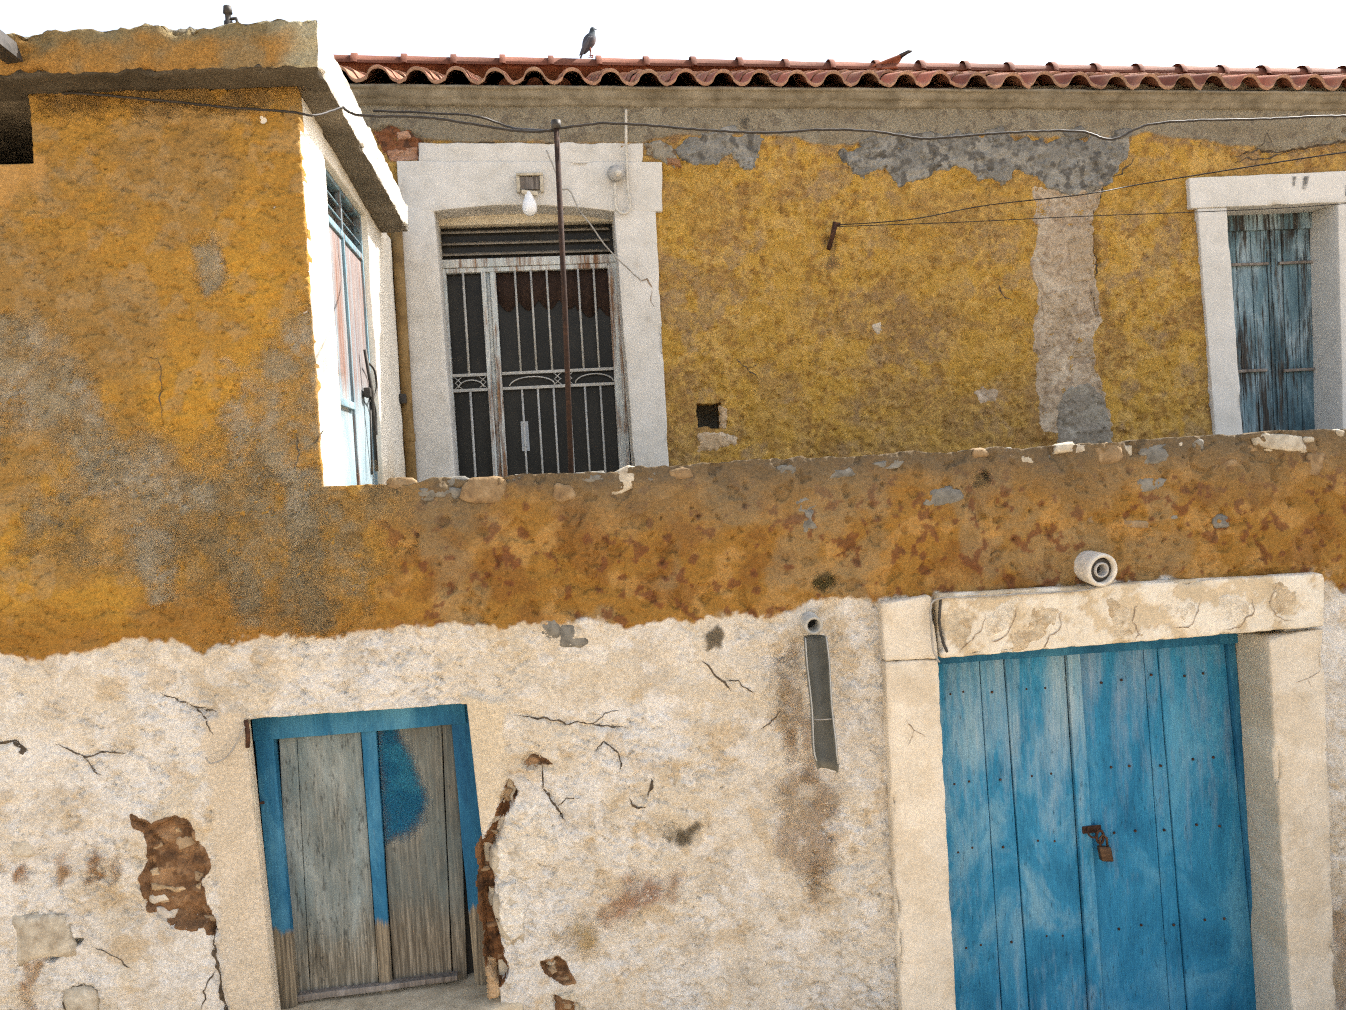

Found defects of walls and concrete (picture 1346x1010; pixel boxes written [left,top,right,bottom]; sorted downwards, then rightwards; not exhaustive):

spalling [644,140,682,168]
peeling [1030,182,1113,433]
crack [702,661,753,693]
crack [0,740,125,775]
spalling [524,754,553,773]
crack [515,710,653,809]
spalling [129,814,217,936]
spalling [475,779,518,1000]
spalling [540,956,586,1010]